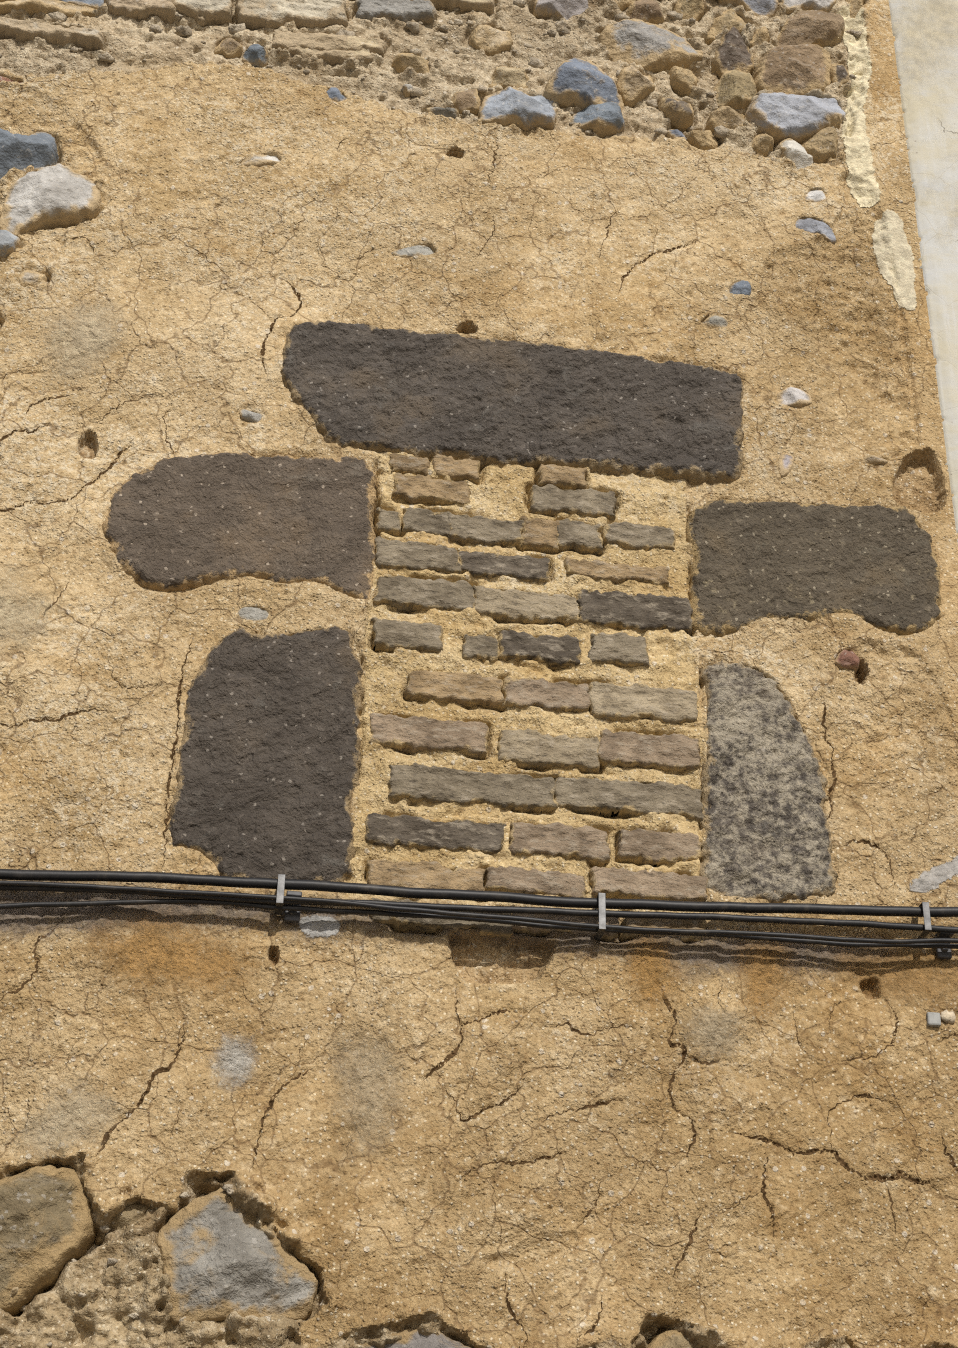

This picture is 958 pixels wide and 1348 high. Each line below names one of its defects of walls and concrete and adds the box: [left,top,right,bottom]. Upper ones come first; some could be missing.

crack [0,370,175,512]
crack [0,638,193,869]
crack [93,1020,185,1157]
crack [253,1037,313,1165]
crack [462,1150,569,1177]
crack [425,987,637,1122]
crack [543,989,958,1280]
spalling [0,1152,488,1348]
crack [504,1273,528,1344]
spalling [479,1228,582,1272]
spalling [577,1316,735,1348]
spalling [802,1335,859,1348]